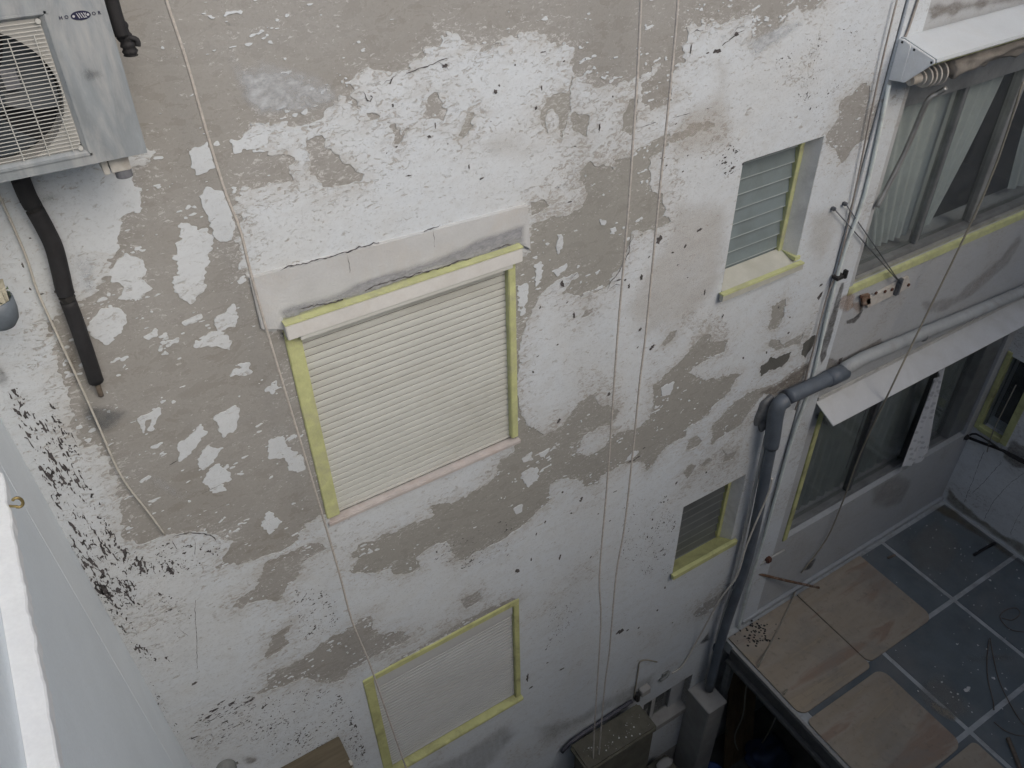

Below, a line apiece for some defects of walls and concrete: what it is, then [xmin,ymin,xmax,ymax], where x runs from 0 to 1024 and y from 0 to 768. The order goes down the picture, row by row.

peeling [800,80,877,163]
crack [282,242,379,270]
crack [301,226,512,309]
peeling [9,0,822,765]